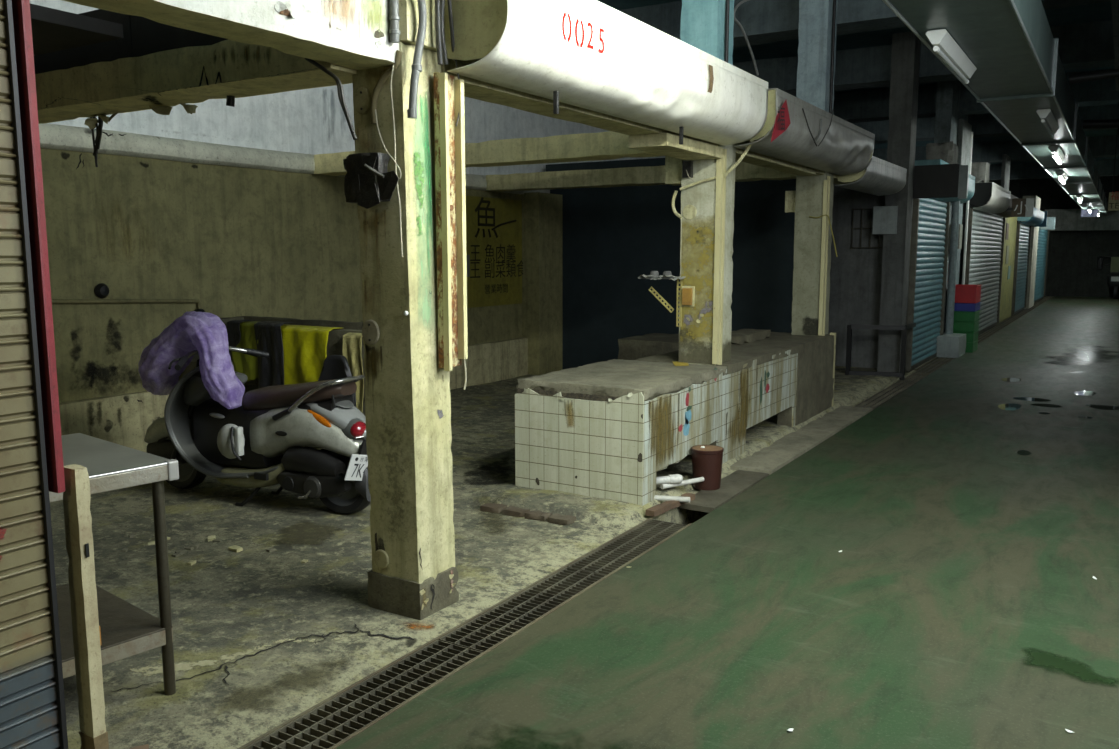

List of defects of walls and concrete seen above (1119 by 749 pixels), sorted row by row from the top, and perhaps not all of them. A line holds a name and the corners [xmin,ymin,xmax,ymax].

damp [71,332,142,425]
crack [113,624,414,692]
damp [1024,648,1119,686]